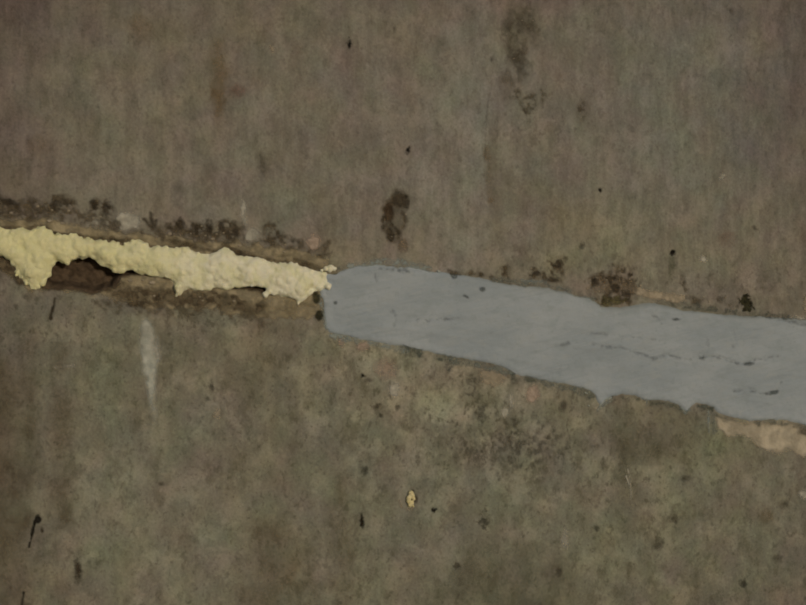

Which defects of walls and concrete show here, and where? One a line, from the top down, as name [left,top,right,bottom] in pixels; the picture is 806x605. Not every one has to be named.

spalling [0,196,75,221]
spalling [90,199,111,223]
spalling [168,219,241,243]
spalling [375,193,409,249]
crack [0,202,337,321]
spalling [586,267,642,306]
leakage [140,320,159,397]